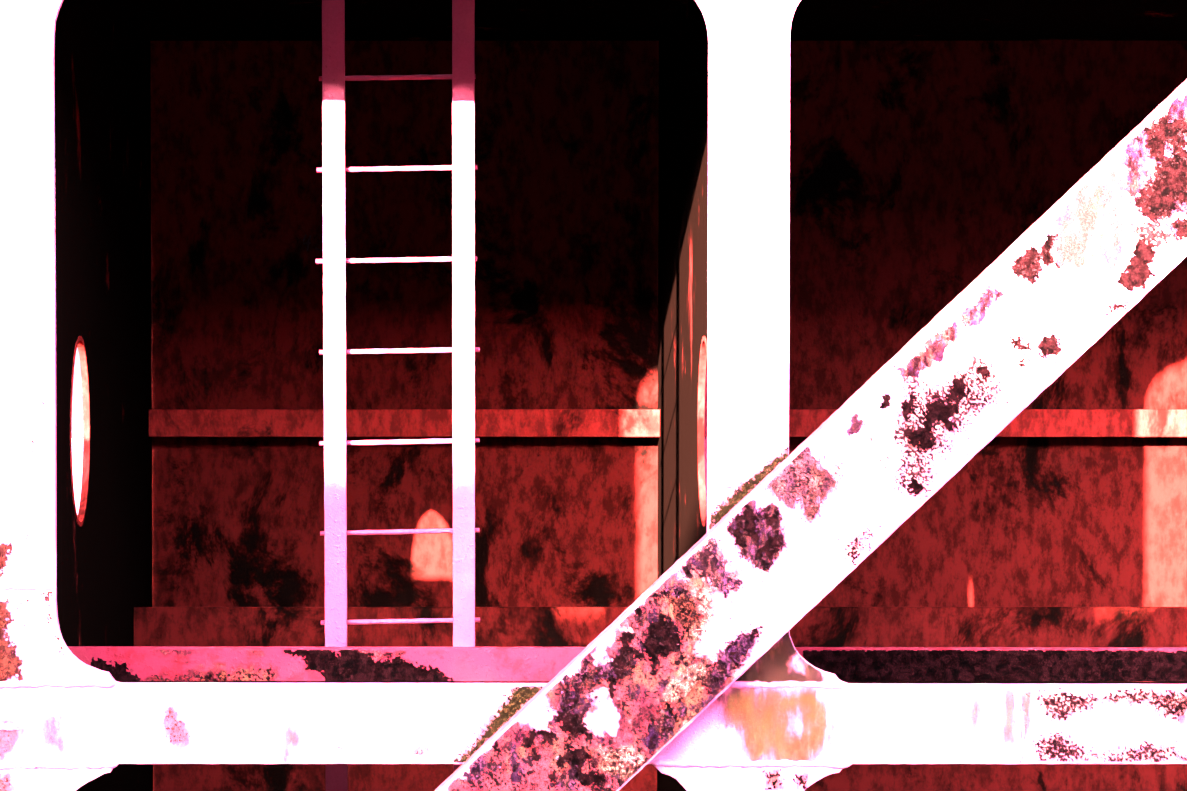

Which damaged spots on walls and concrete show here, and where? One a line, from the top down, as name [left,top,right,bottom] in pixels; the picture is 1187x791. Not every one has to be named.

rust [1083,94,1187,324]
rust [846,234,1077,500]
rust [0,542,12,577]
rust [833,515,881,565]
rust [0,598,23,682]
rust [40,591,65,657]
rust [448,443,857,791]
damp [718,688,831,761]
rust [1030,687,1187,762]